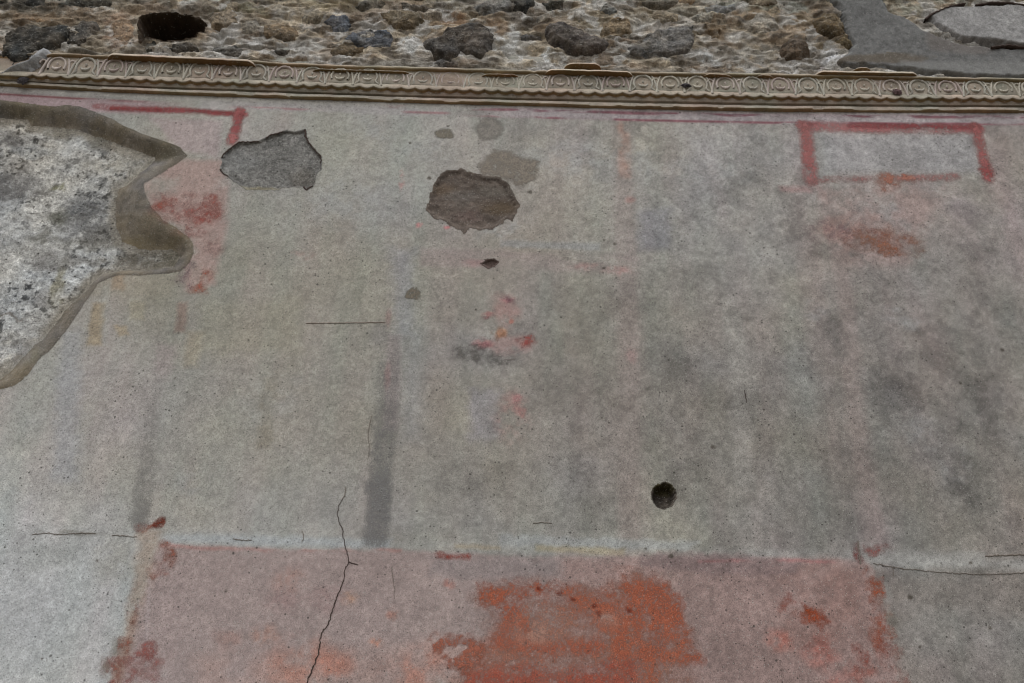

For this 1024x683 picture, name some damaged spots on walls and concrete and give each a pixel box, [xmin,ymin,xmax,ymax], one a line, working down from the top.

flaking render [220,129,322,191]
flaking render [426,168,520,234]
flaking render [0,100,194,389]
crack [307,487,358,683]
crack [857,541,1024,576]